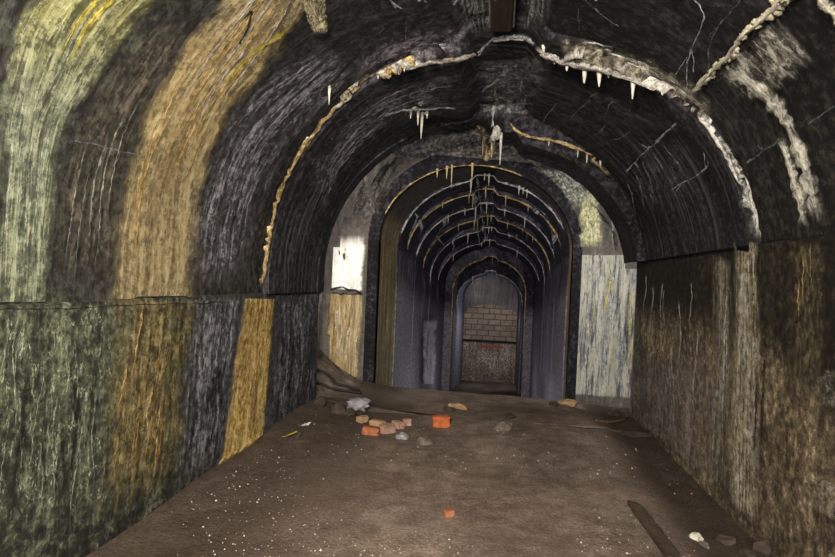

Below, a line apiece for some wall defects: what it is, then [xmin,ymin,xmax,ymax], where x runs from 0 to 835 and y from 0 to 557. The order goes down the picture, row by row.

leakage [0,0,151,317]
leakage [66,0,815,464]
crack [676,0,740,93]
leakage [0,309,123,517]
leakage [576,244,767,516]